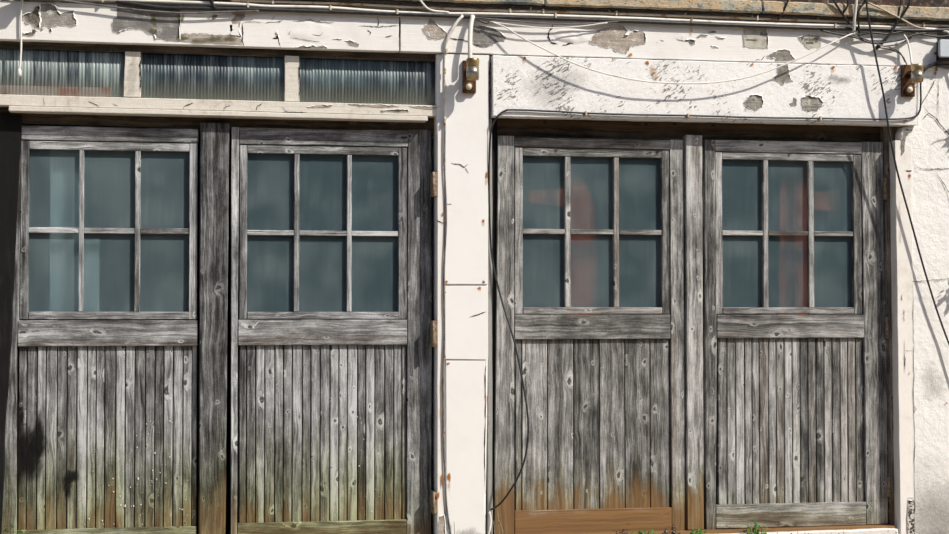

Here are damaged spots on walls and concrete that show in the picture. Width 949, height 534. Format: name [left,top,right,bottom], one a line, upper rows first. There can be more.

peeling [22,2,78,37]
peeling [111,3,246,45]
peeling [422,18,506,48]
peeling [589,25,647,55]
peeling [742,28,797,85]
peeling [743,94,764,111]
peeling [790,95,824,112]
crack [901,278,949,496]